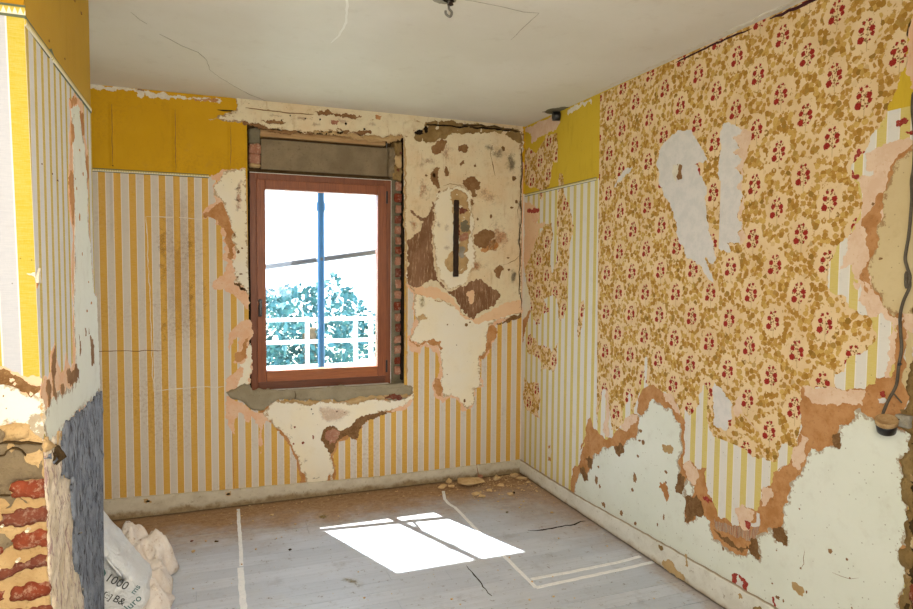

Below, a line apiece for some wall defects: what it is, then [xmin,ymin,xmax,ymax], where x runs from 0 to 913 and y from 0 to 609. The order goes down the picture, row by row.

flaking render [90,84,221,103]
flaking render [208,98,592,207]
peeling [672,164,682,181]
peeling [852,149,873,180]
flaking render [213,168,249,295]
flaking render [432,184,477,289]
flaking render [867,151,913,317]
flaking render [0,104,101,609]
flaking render [237,344,253,387]
flaking render [410,266,531,409]
flaking render [263,392,414,482]
flaking render [574,330,913,609]